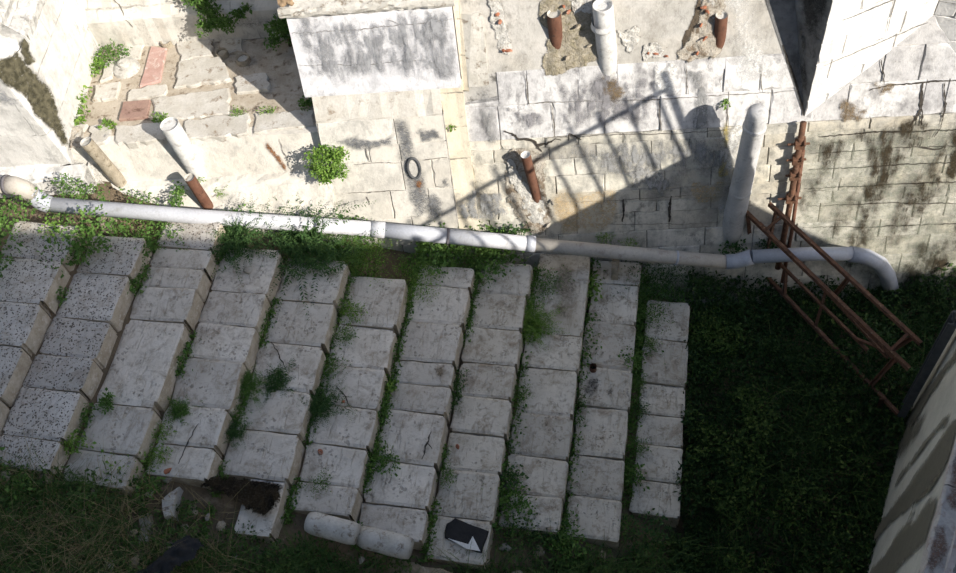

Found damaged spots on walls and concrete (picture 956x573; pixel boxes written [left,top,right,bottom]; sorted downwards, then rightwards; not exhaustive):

damp [21,35,35,65]
damp [301,12,455,82]
spalling [488,0,513,55]
spalling [539,0,598,76]
spalling [617,0,726,63]
damp [345,121,439,163]
crack [504,130,581,152]
damp [560,63,678,127]
crack [910,83,947,150]
spalling [504,148,554,235]
damp [834,120,930,247]
damp [891,130,956,242]